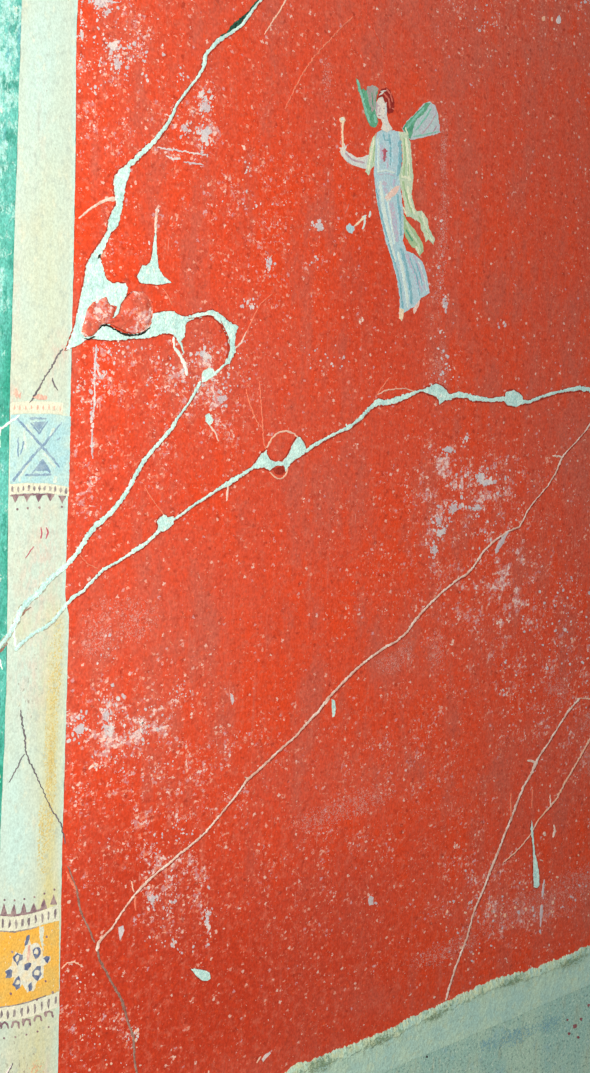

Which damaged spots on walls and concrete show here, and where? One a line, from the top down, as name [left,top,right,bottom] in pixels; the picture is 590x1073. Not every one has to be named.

crack [127,0,287,168]
crack [285,16,353,109]
flaking render [64,162,272,393]
crack [0,349,63,447]
peeling [89,363,103,447]
crack [0,377,590,670]
crack [9,422,590,1073]
peeling [190,968,211,982]